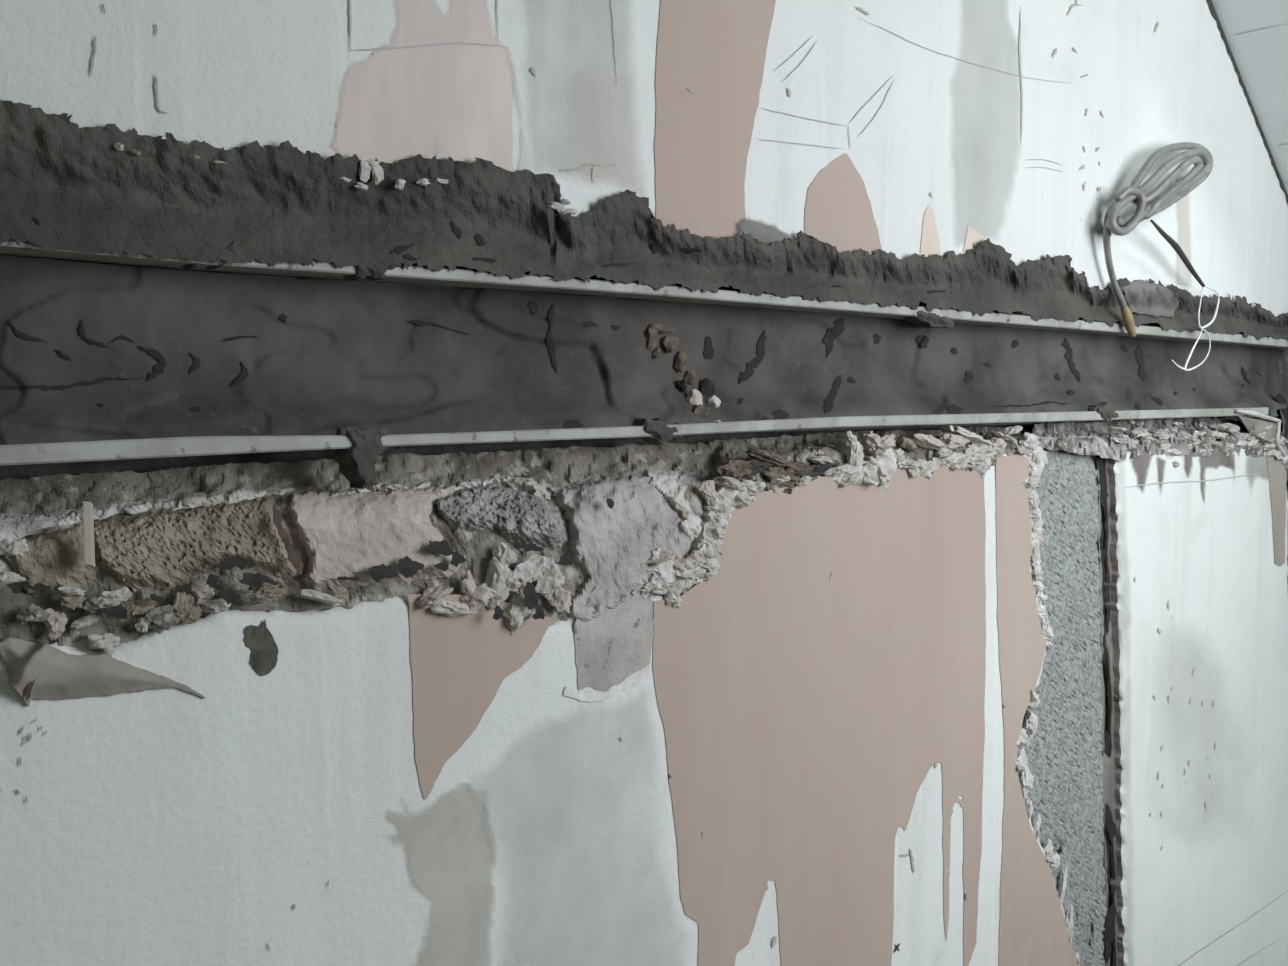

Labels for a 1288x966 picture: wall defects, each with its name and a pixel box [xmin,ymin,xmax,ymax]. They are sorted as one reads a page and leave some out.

peeling [332,0,514,190]
peeling [654,0,776,254]
peeling [804,153,882,255]
crack [0,319,259,390]
peeling [0,404,1288,966]